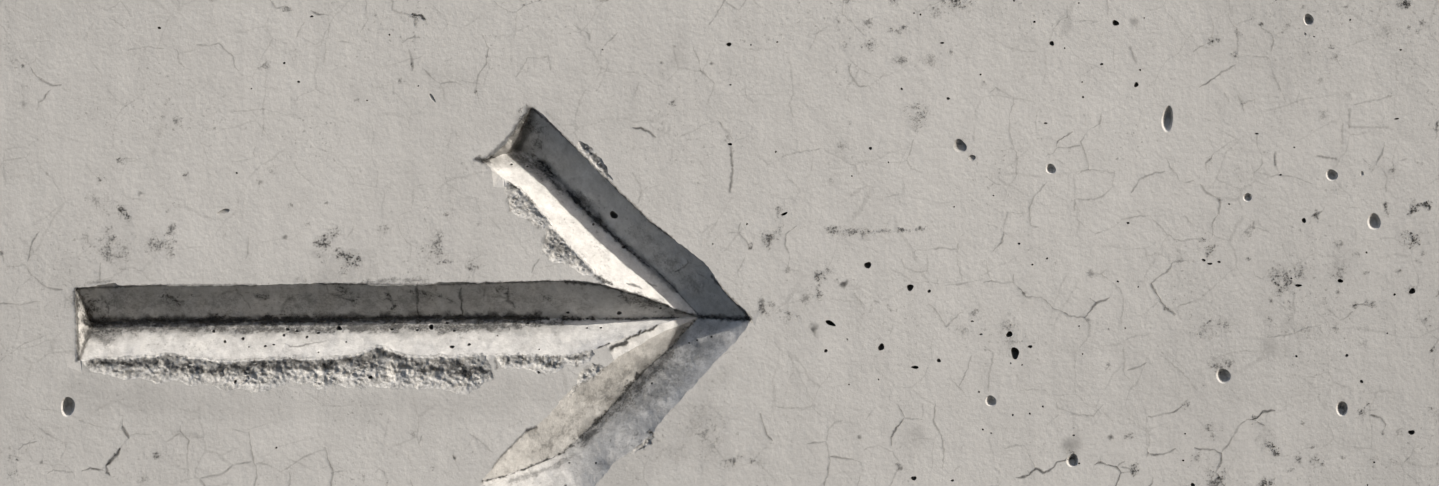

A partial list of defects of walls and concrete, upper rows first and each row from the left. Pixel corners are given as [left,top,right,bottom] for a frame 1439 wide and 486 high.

crack [92,434,129,475]
crack [1022,457,1121,485]